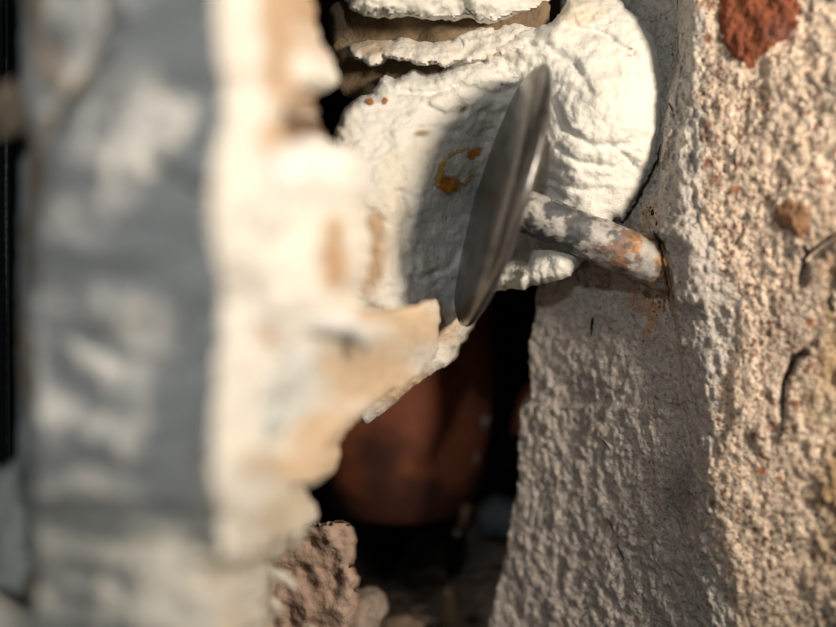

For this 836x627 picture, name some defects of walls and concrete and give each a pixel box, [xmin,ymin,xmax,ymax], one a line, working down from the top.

flaking render [716,0,800,69]
rust [435,147,481,195]
crack [621,144,661,224]
crack [777,352,807,444]